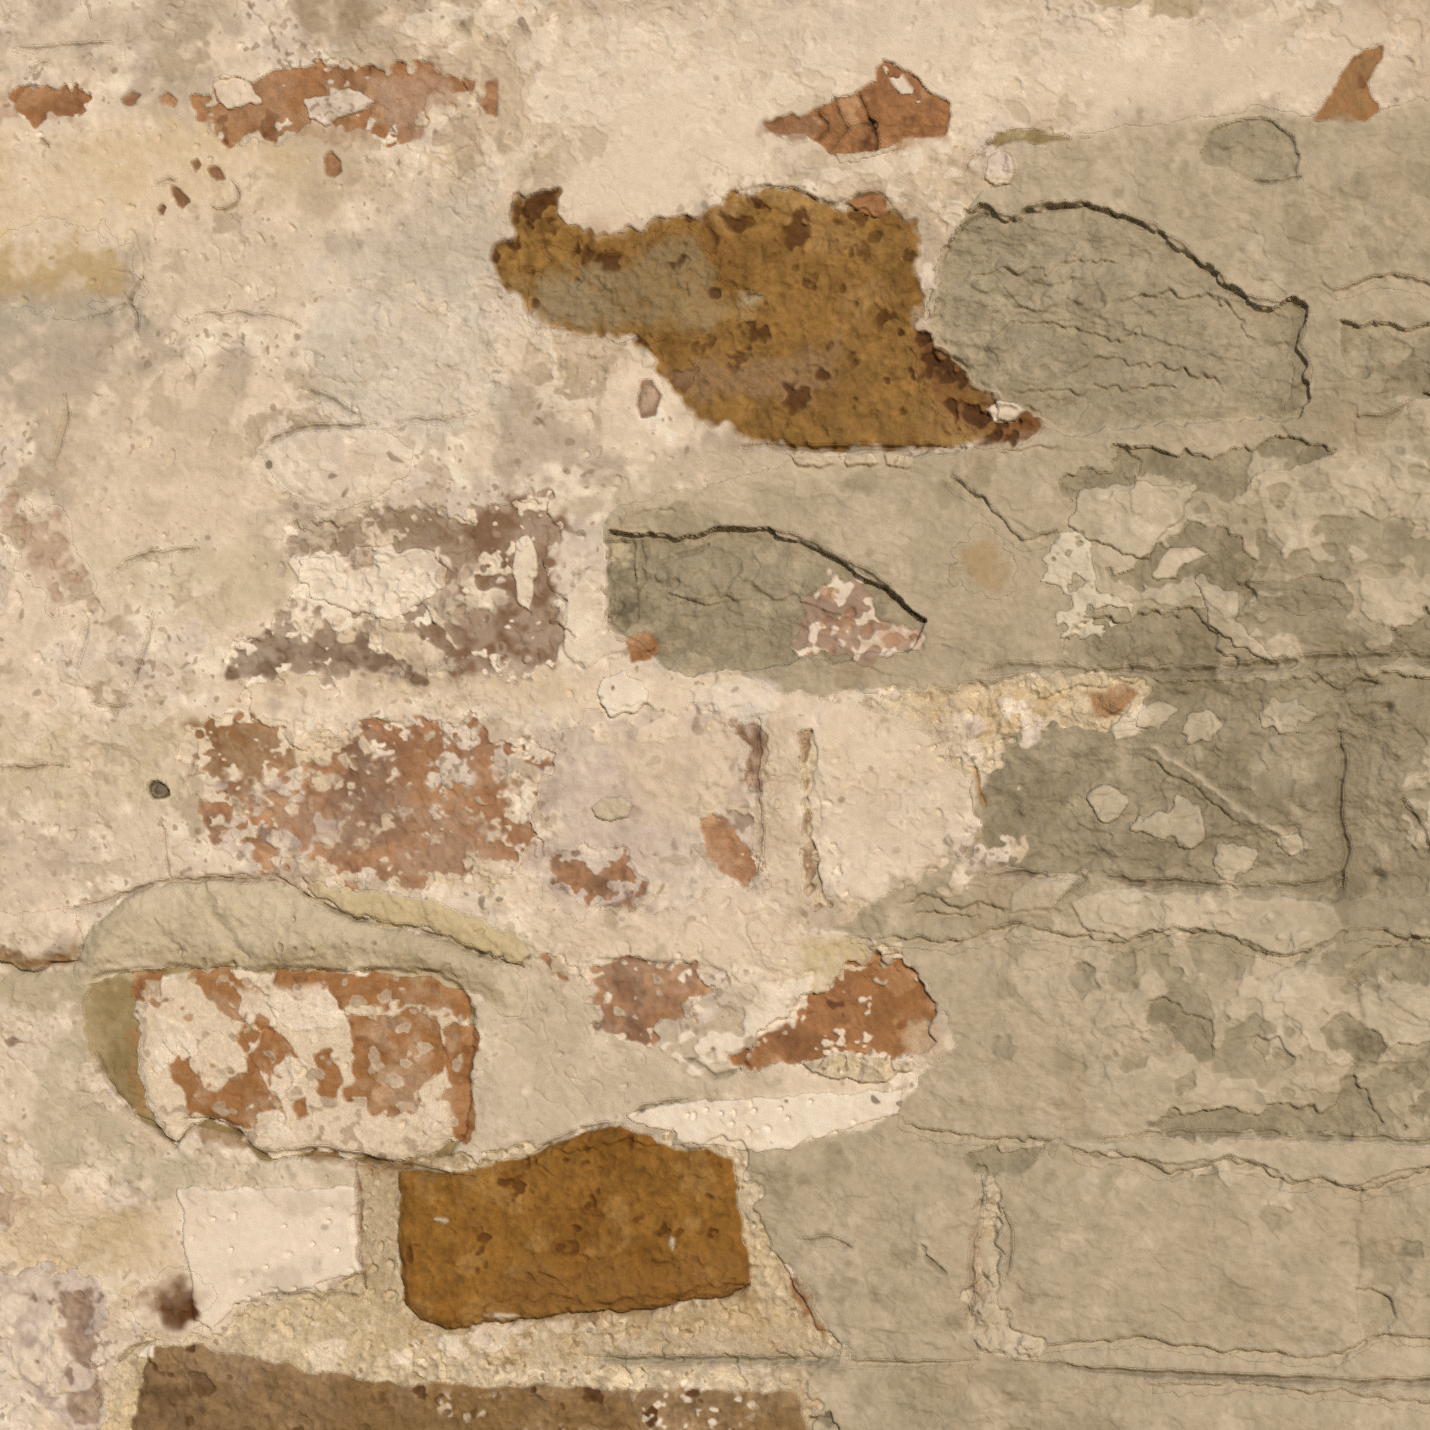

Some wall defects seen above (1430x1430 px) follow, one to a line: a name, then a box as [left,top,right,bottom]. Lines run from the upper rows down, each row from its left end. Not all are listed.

flaking render [8,82,92,130]
flaking render [159,57,498,149]
flaking render [763,59,952,164]
flaking render [1313,44,1383,122]
flaking render [489,128,1430,912]
peeling [175,487,927,923]
crack [63,820,525,968]
crack [850,868,1430,967]
spalling [727,945,938,1083]
peeling [1145,1012,1430,1145]
flaking render [83,952,842,1430]
crack [897,1115,1430,1202]